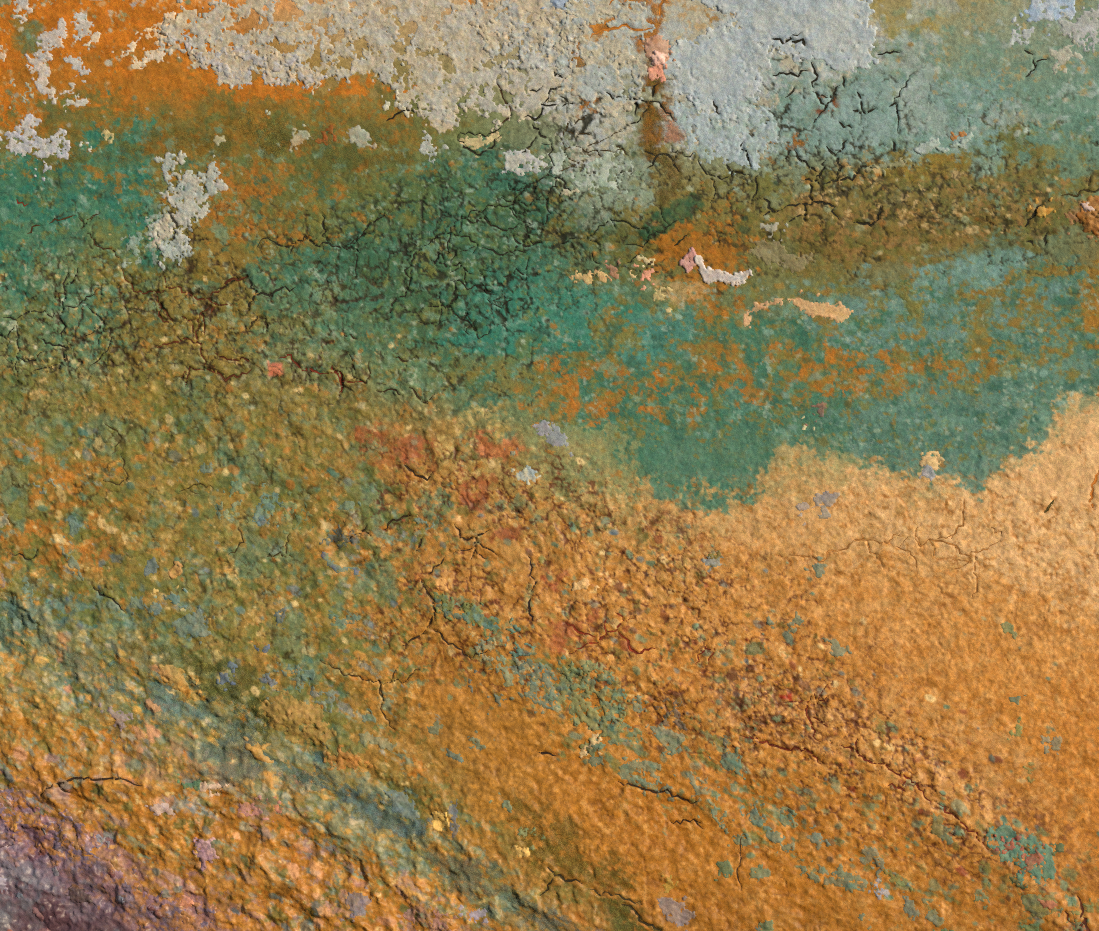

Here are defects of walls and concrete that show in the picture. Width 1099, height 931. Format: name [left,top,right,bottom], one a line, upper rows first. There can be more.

peeling [0,12,101,181]
peeling [112,0,656,208]
peeling [663,0,879,175]
crack [0,268,113,373]
crack [17,200,296,385]
peeling [120,135,228,271]
crack [278,334,432,404]
peeling [679,222,816,287]
peeling [743,289,853,328]
crack [320,515,497,729]
crack [740,684,989,850]
crack [540,867,661,931]